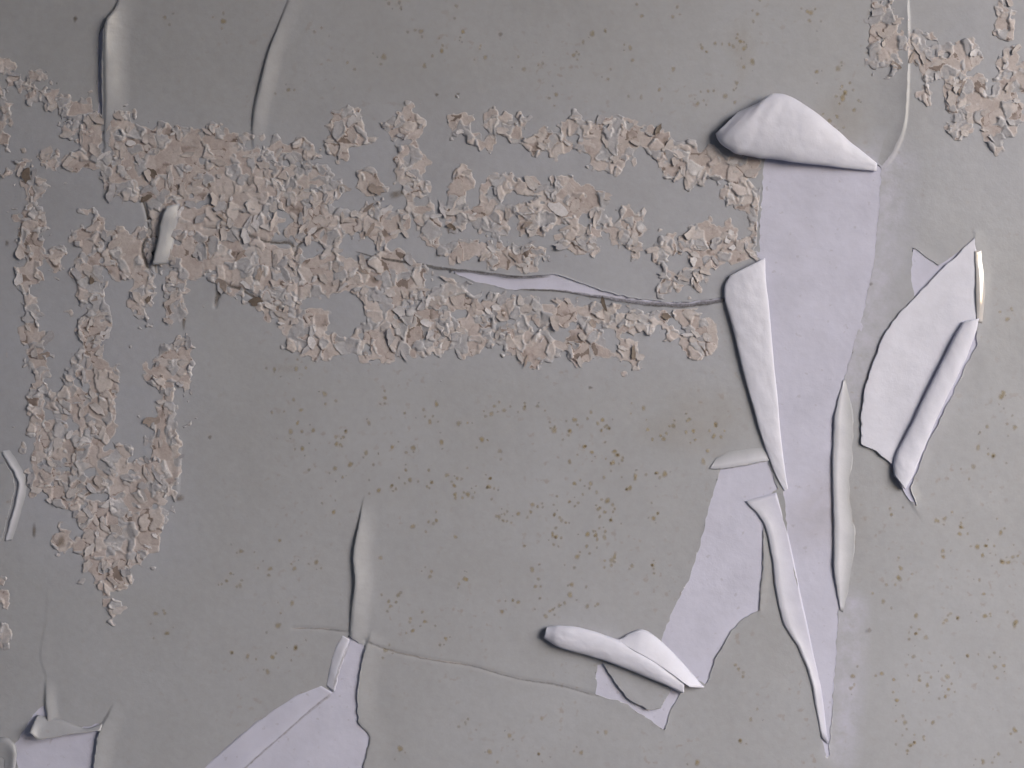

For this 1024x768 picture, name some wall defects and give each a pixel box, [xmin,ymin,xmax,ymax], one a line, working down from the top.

peeling [0,0,719,626]
crack [359,252,724,307]
peeling [446,0,1024,757]
peeling [0,706,102,768]
peeling [205,499,392,768]